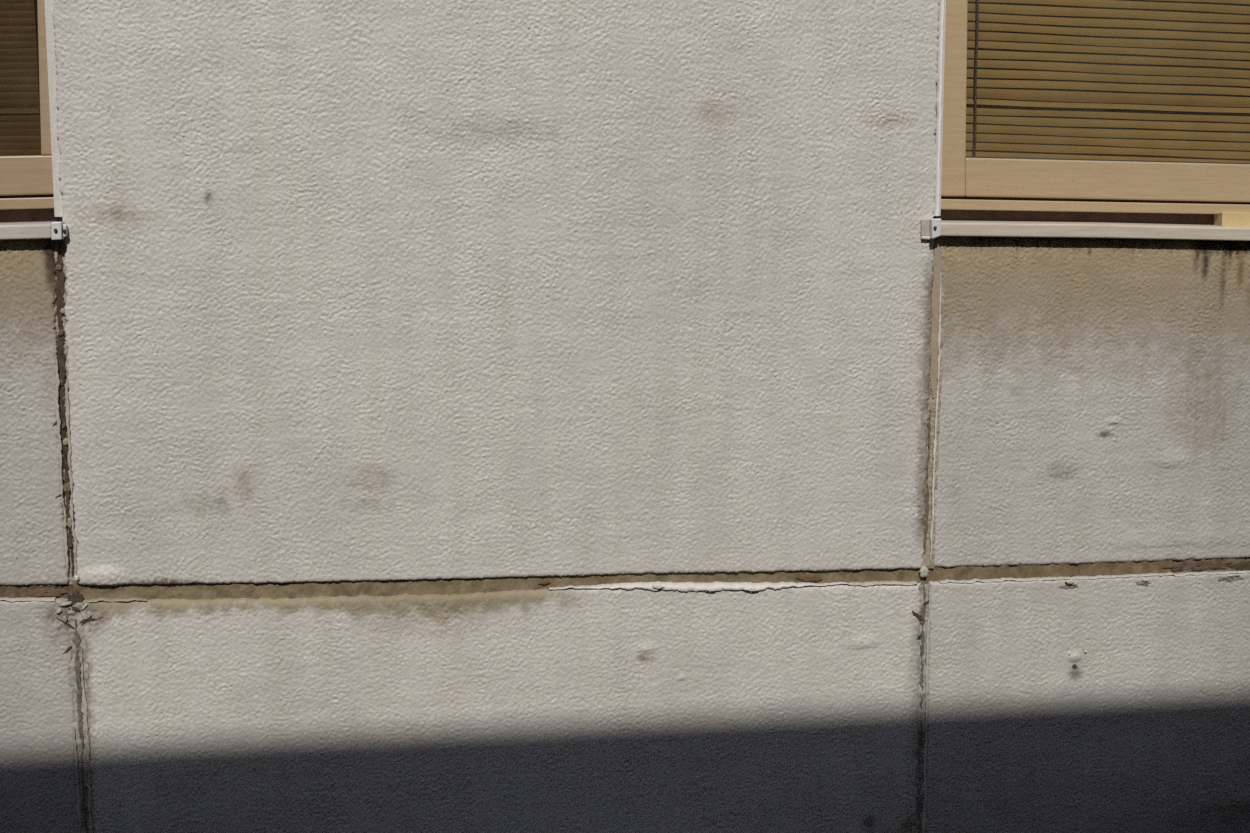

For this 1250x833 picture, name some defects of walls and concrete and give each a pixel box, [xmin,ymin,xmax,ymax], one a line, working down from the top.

water stain [942,236,1250,332]
water stain [90,589,552,612]